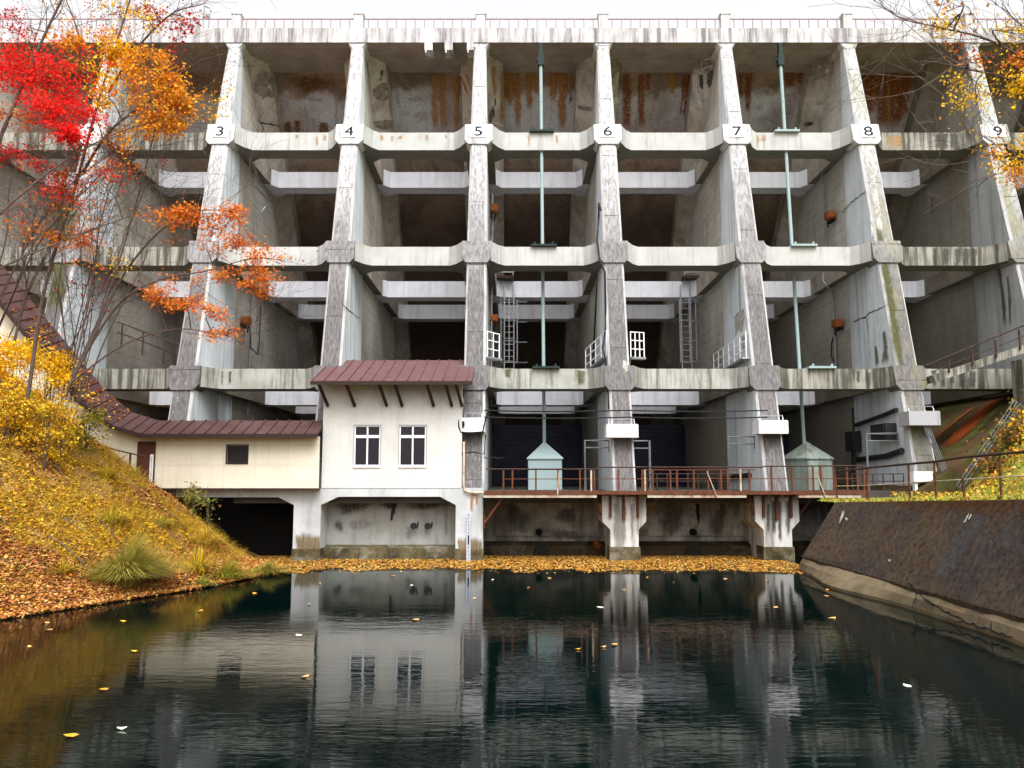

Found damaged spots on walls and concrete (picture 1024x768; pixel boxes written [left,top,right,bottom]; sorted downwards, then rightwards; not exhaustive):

spalling [373,70,391,101]
spalling [374,118,393,130]
corrosion [426,74,471,139]
corrosion [492,66,572,124]
corrosion [623,74,651,125]
corrosion [668,74,690,114]
corrosion [863,73,910,123]
crack [908,582,1014,639]